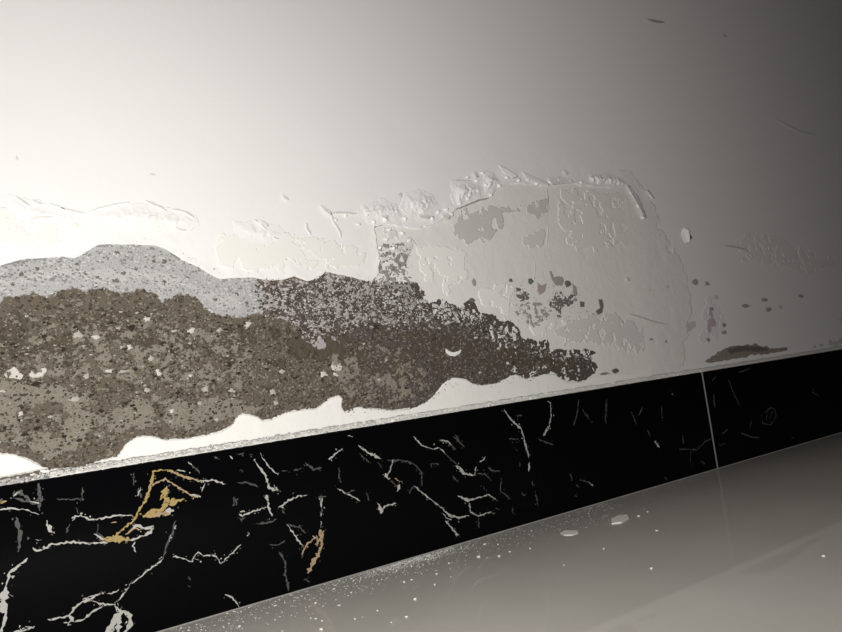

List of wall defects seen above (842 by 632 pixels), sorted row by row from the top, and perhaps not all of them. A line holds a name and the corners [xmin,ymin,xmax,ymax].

peeling [0,170,692,480]